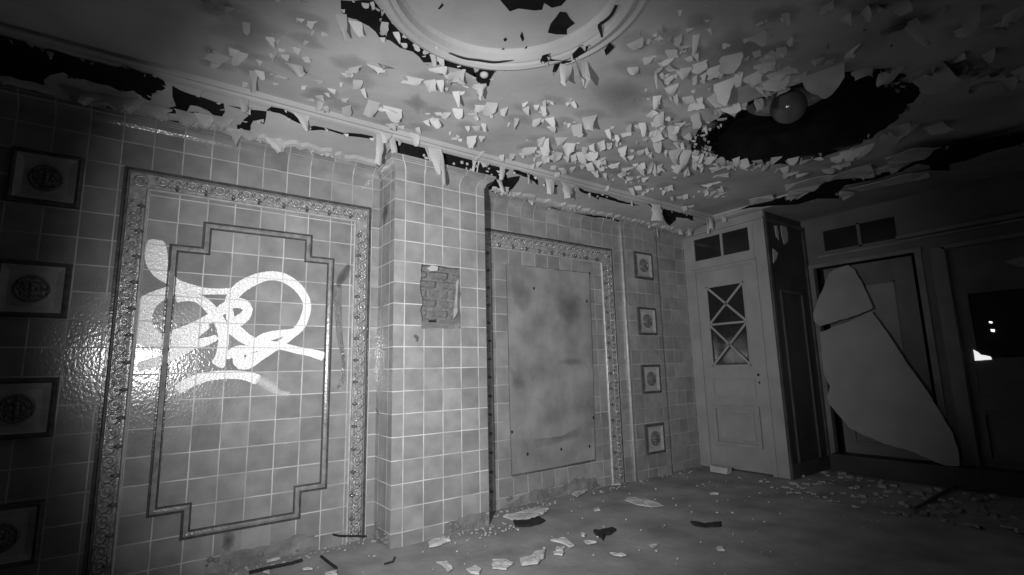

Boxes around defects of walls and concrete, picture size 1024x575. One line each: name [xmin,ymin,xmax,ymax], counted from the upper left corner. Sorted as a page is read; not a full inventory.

peeling [202,0,1024,212]